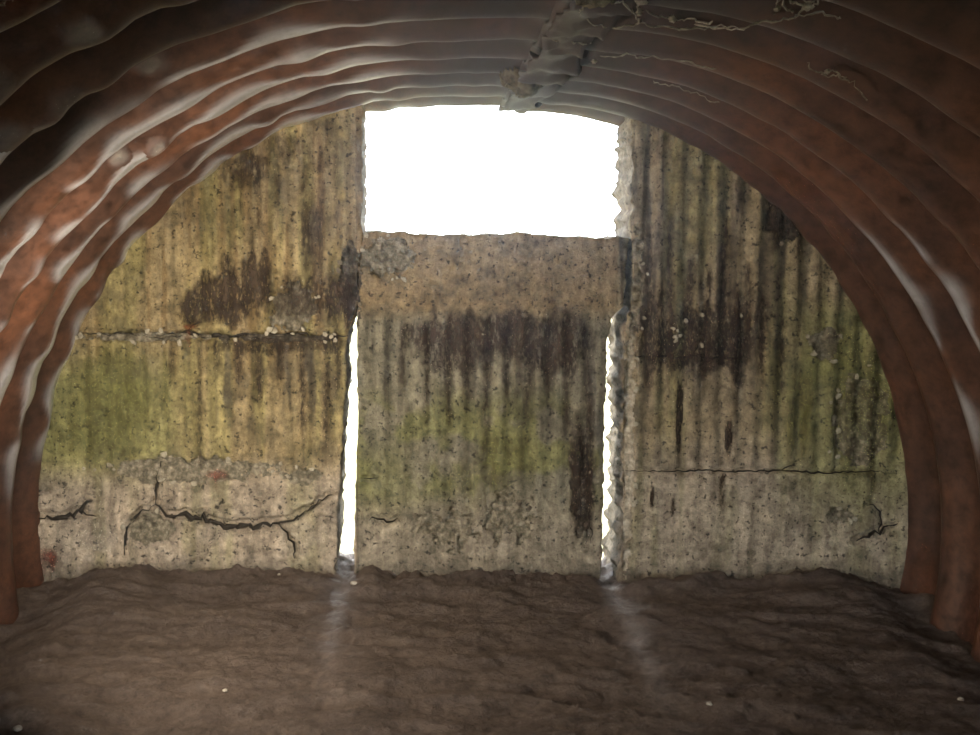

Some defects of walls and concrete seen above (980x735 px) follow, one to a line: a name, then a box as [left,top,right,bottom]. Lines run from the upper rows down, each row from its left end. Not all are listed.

water stain [180,249,355,439]
water stain [638,218,765,385]
water stain [401,306,594,531]
water stain [667,381,683,453]
water stain [724,421,732,450]
crack [39,500,97,521]
crack [124,461,332,559]
crack [856,504,897,541]